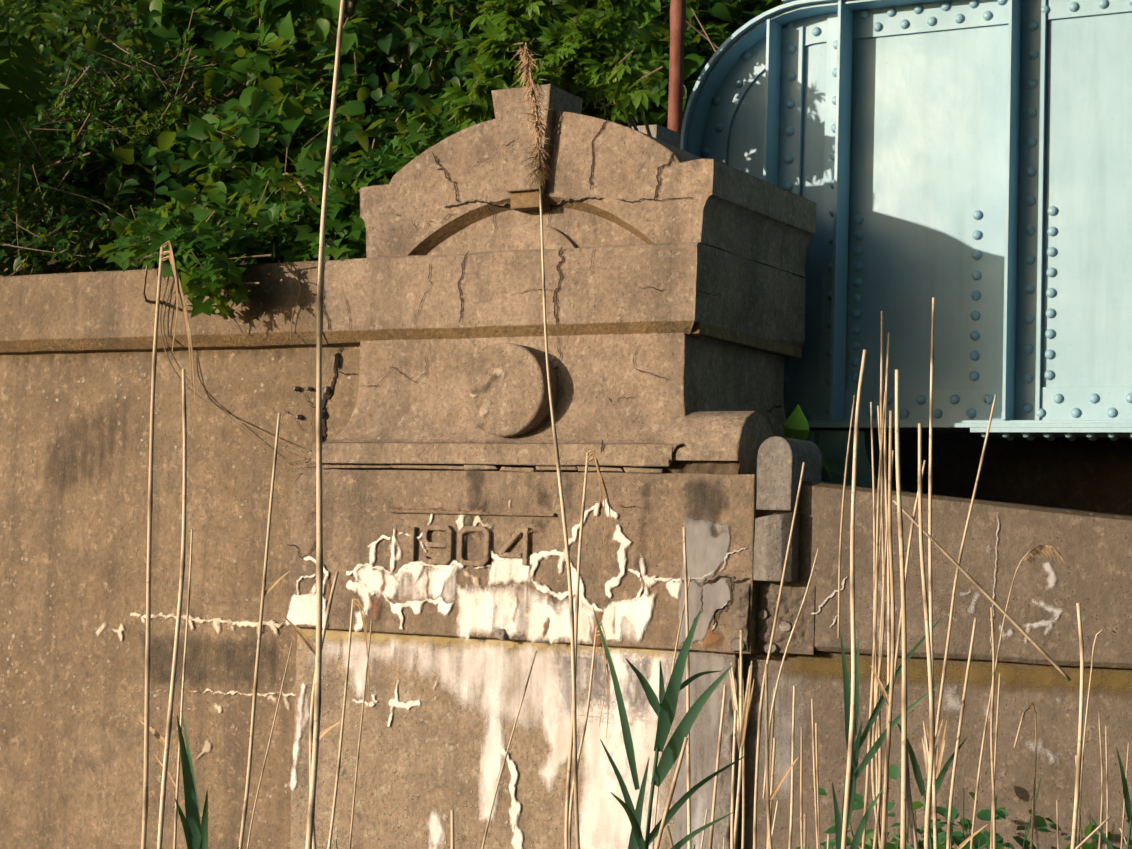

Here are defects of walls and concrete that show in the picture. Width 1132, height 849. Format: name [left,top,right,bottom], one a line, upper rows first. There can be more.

crack [414,251,469,322]
crack [396,139,517,234]
crack [515,110,693,396]
crack [286,290,427,442]
water stain [130,470,725,849]